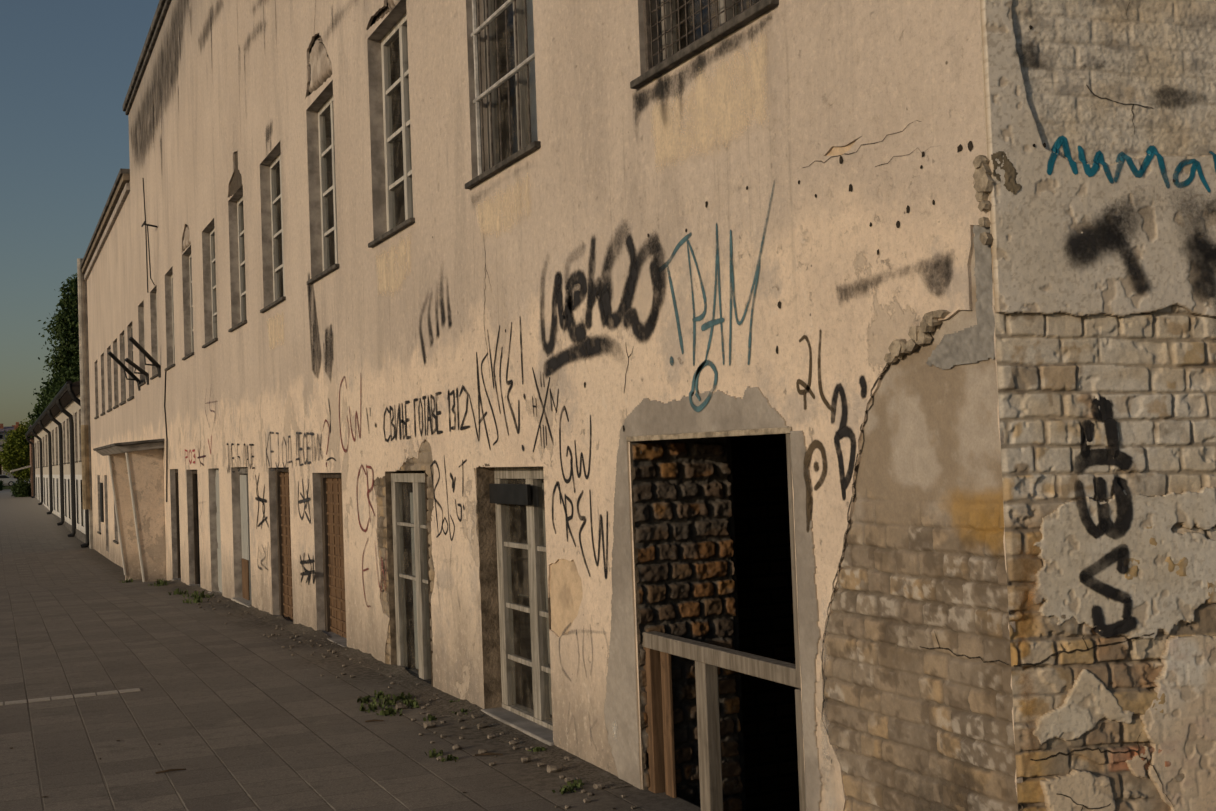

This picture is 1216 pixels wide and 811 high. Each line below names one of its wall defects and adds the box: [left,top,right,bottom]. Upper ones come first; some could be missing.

water stain [131,0,185,169]
water stain [633,18,768,119]
crack [803,120,929,168]
flaking render [374,477,391,664]
flaking render [398,441,435,673]
flaking render [824,141,1023,811]
peeling [1032,487,1216,811]